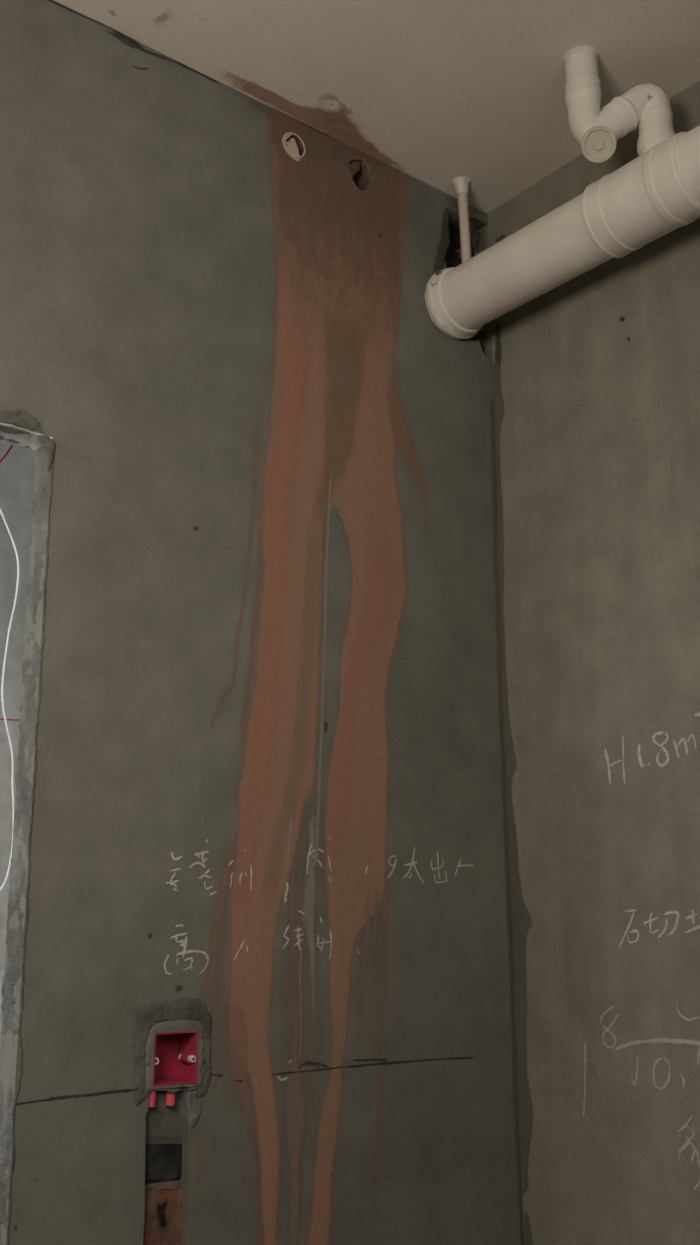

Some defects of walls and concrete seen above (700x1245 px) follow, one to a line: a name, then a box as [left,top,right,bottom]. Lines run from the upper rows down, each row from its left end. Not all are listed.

corrosion [201,106,429,1245]